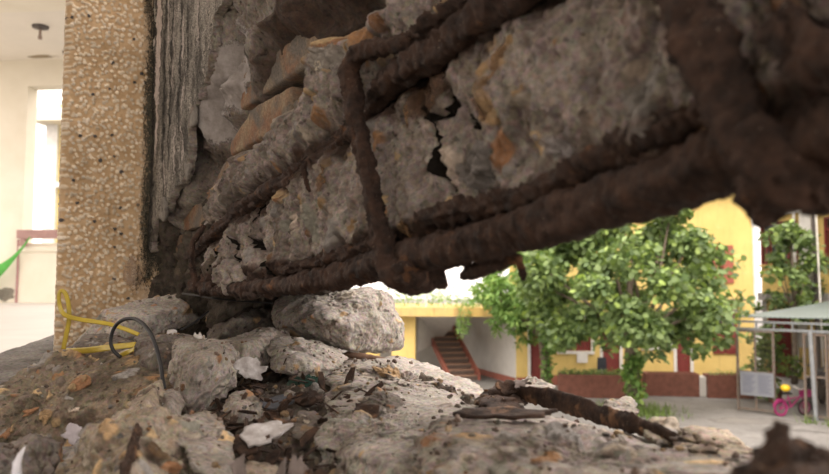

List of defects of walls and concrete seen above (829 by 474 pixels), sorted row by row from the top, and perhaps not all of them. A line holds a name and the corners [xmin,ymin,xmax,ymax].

corrosion [400,0,472,41]
corrosion [753,0,829,95]
corrosion [403,69,453,127]
spalling [175,19,346,260]
crack [420,96,482,194]
spalling [455,139,496,190]
corrosion [412,102,705,230]
corrosion [276,235,372,276]
corrosion [453,378,680,446]